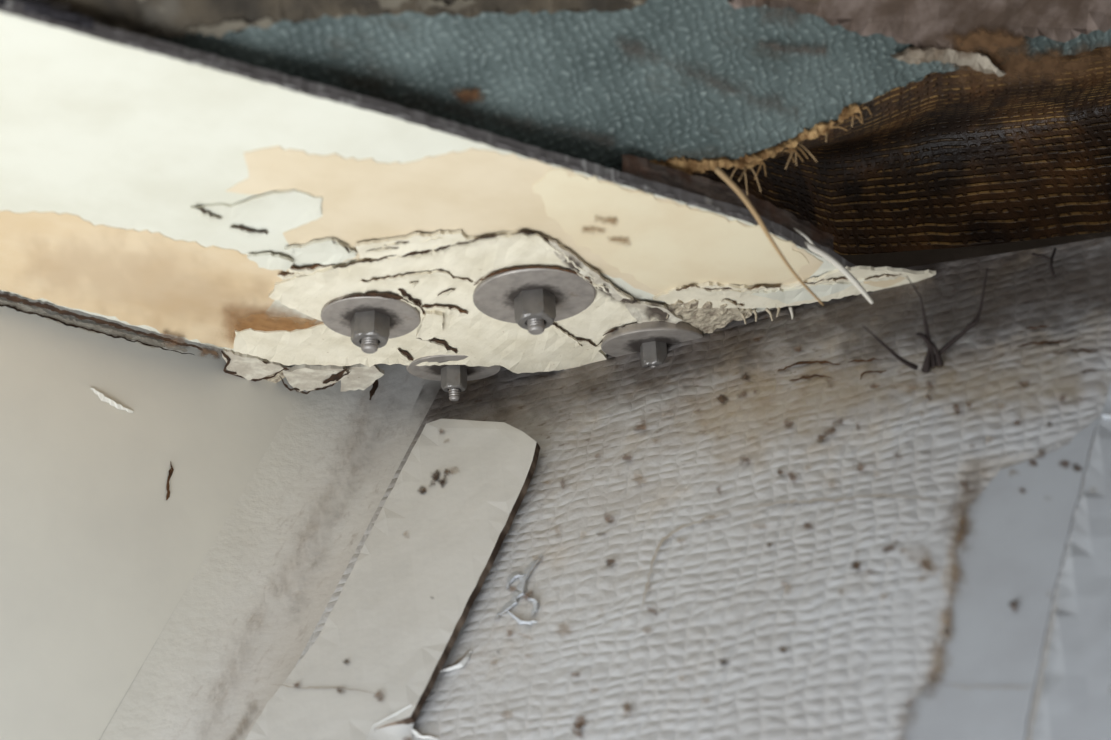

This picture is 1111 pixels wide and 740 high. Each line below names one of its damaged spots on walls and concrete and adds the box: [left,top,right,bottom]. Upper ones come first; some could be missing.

peeling [726,0,1111,77]
crack [0,293,379,400]
rust [230,311,321,338]
crack [277,231,612,363]
peeling [0,146,936,391]
crack [551,324,625,348]